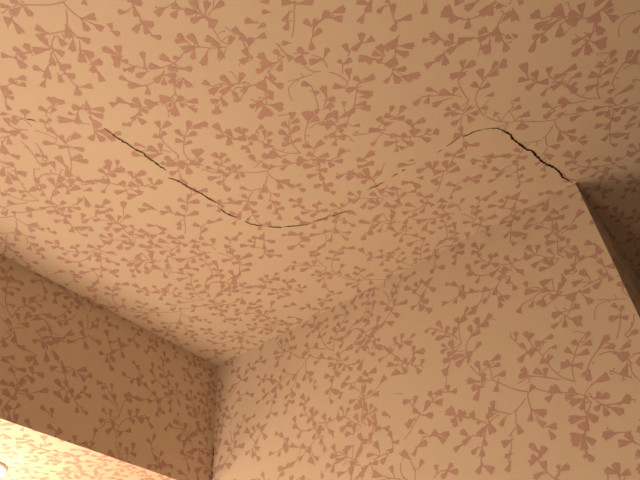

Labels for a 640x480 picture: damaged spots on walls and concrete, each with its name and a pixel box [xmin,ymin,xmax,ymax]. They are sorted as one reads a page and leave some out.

crack [104,128,352,228]
crack [437,128,573,183]